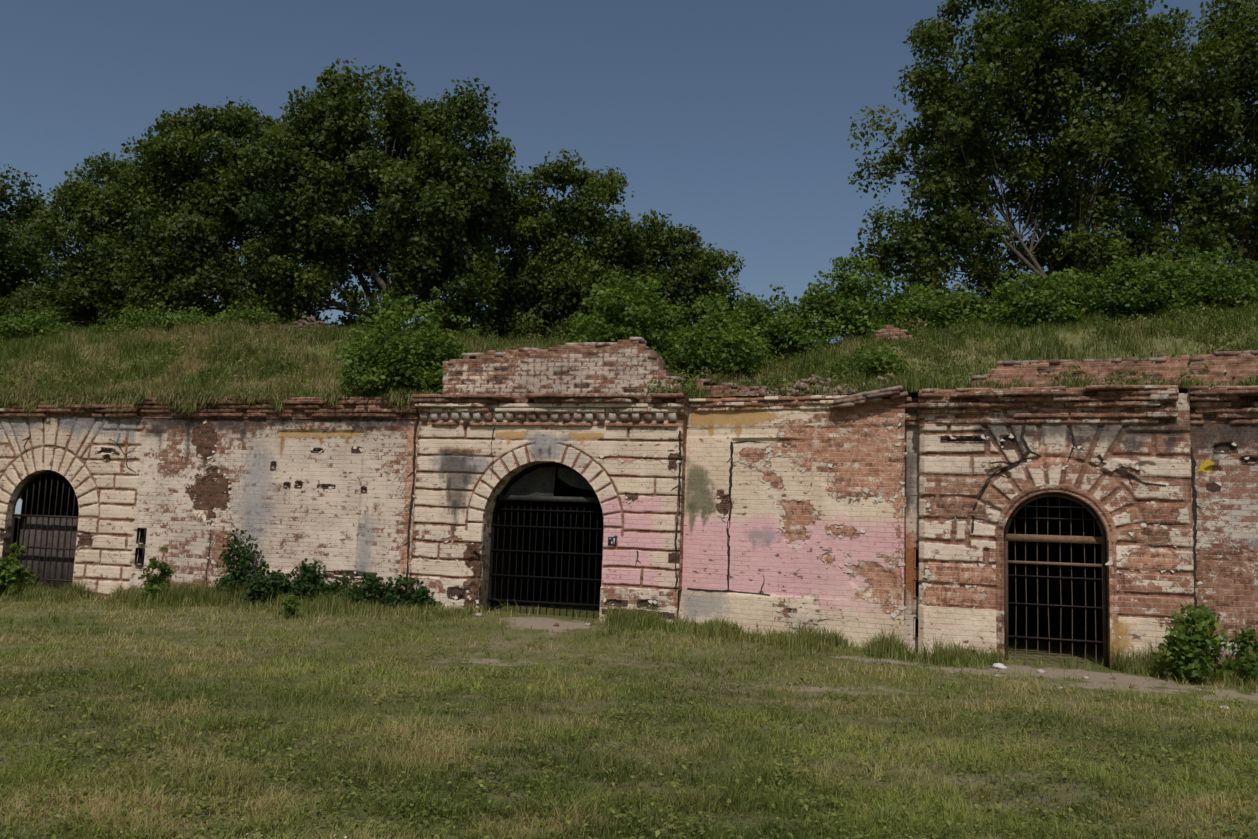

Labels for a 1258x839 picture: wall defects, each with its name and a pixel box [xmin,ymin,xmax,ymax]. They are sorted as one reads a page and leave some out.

spalling [1212,442,1258,465]
peeling [156,419,239,583]
damp [690,503,707,525]
peeling [734,413,910,624]
peeling [926,497,993,522]
spalling [1206,482,1222,492]
peeling [920,559,1001,608]
peeling [1105,501,1258,653]